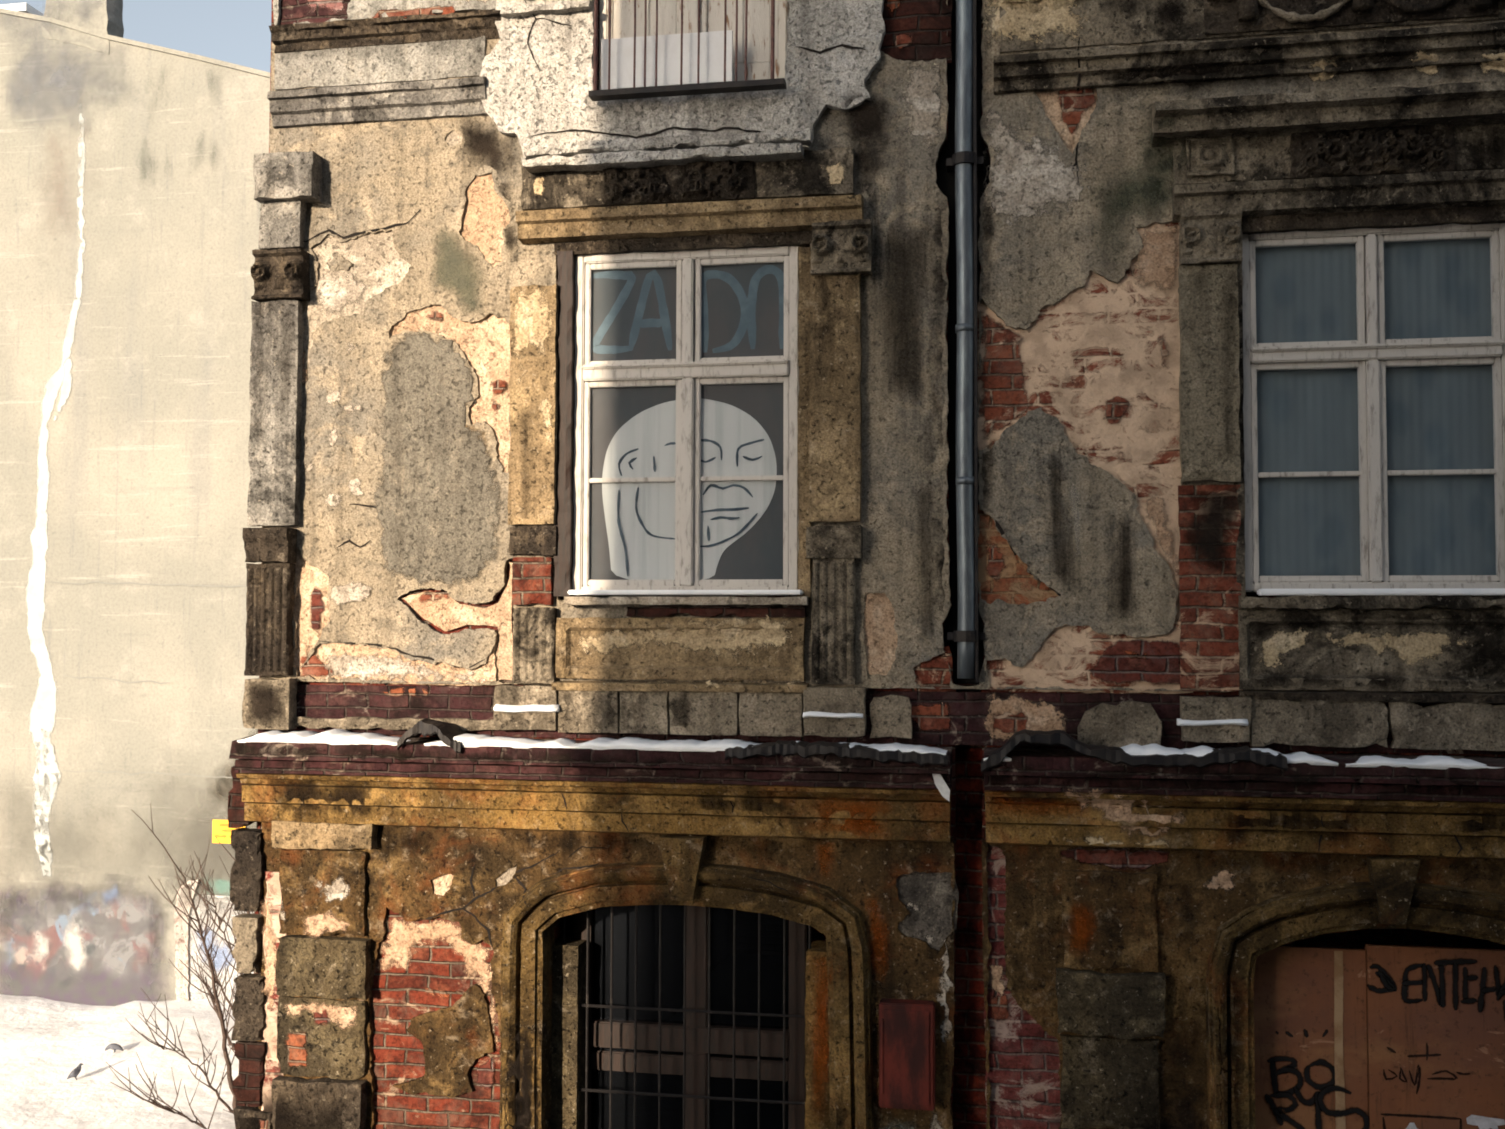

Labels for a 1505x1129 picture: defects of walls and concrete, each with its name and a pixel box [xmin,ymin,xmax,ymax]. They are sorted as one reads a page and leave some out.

crack [524,0,572,71]
crack [795,44,866,54]
flaking render [880,0,953,148]
crack [531,127,783,139]
peeling [982,88,1098,226]
crack [303,210,420,242]
flaking render [460,174,510,267]
flaking render [391,288,553,473]
flaking render [977,222,1193,741]
flaking render [305,877,349,936]
flaking render [432,874,453,896]
flaking render [260,901,501,1129]